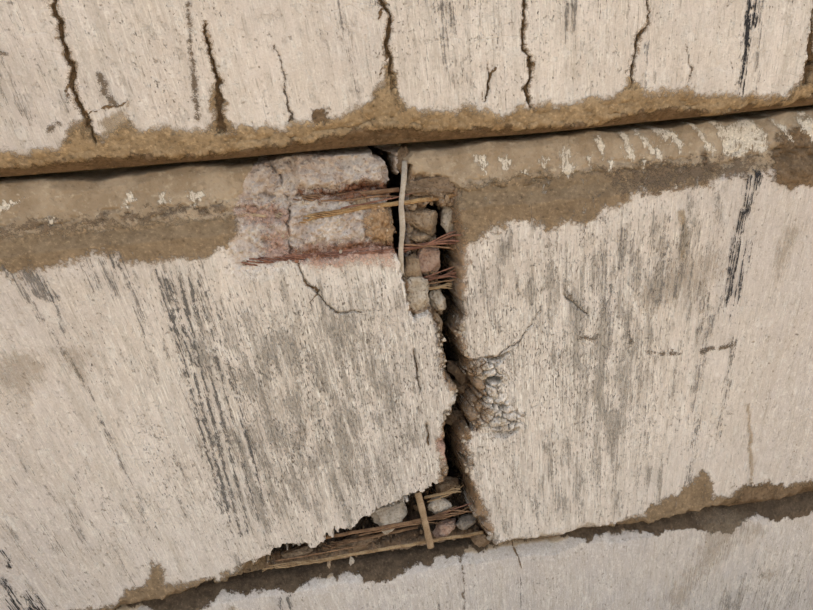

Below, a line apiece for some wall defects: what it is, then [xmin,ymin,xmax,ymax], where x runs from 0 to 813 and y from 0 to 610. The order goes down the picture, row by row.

crack [48,0,126,128]
leakage [0,201,239,335]
crack [202,20,226,134]
corrosion [236,177,396,268]
spalling [154,143,486,570]
leakage [0,0,813,177]
crack [368,146,541,486]
crack [520,0,535,108]
peeling [512,177,725,522]
leakage [452,127,813,450]
peeling [613,124,685,179]
leakage [84,461,813,610]